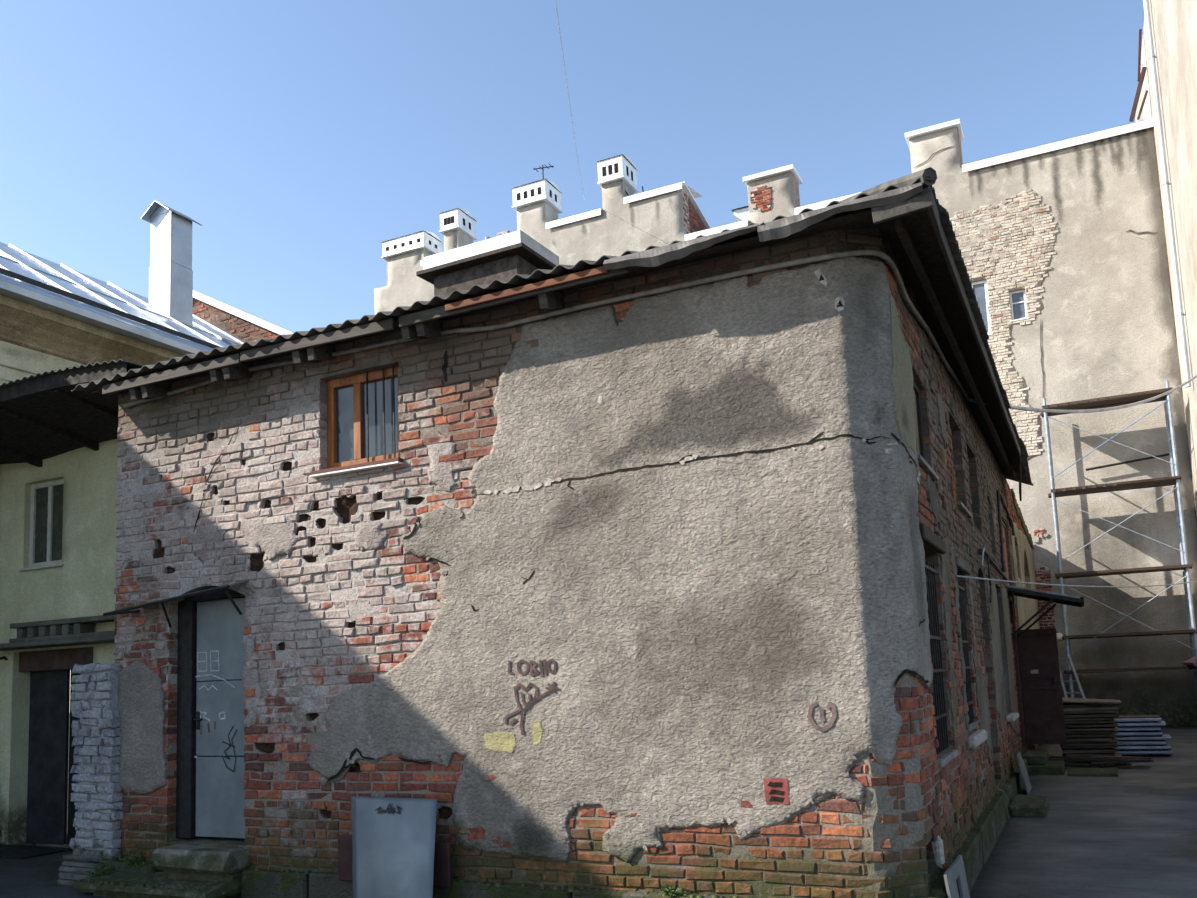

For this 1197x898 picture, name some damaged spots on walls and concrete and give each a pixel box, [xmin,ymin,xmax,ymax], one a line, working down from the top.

leakage [1075,129,1146,193]
spalling [950,189,1059,459]
leakage [601,370,810,464]
spalling [153,540,176,574]
spalling [248,554,264,572]
spalling [296,496,359,563]
spalling [349,488,477,687]
crack [474,432,943,539]
spalling [255,743,275,753]
spalling [321,751,500,866]
spalling [564,670,955,898]